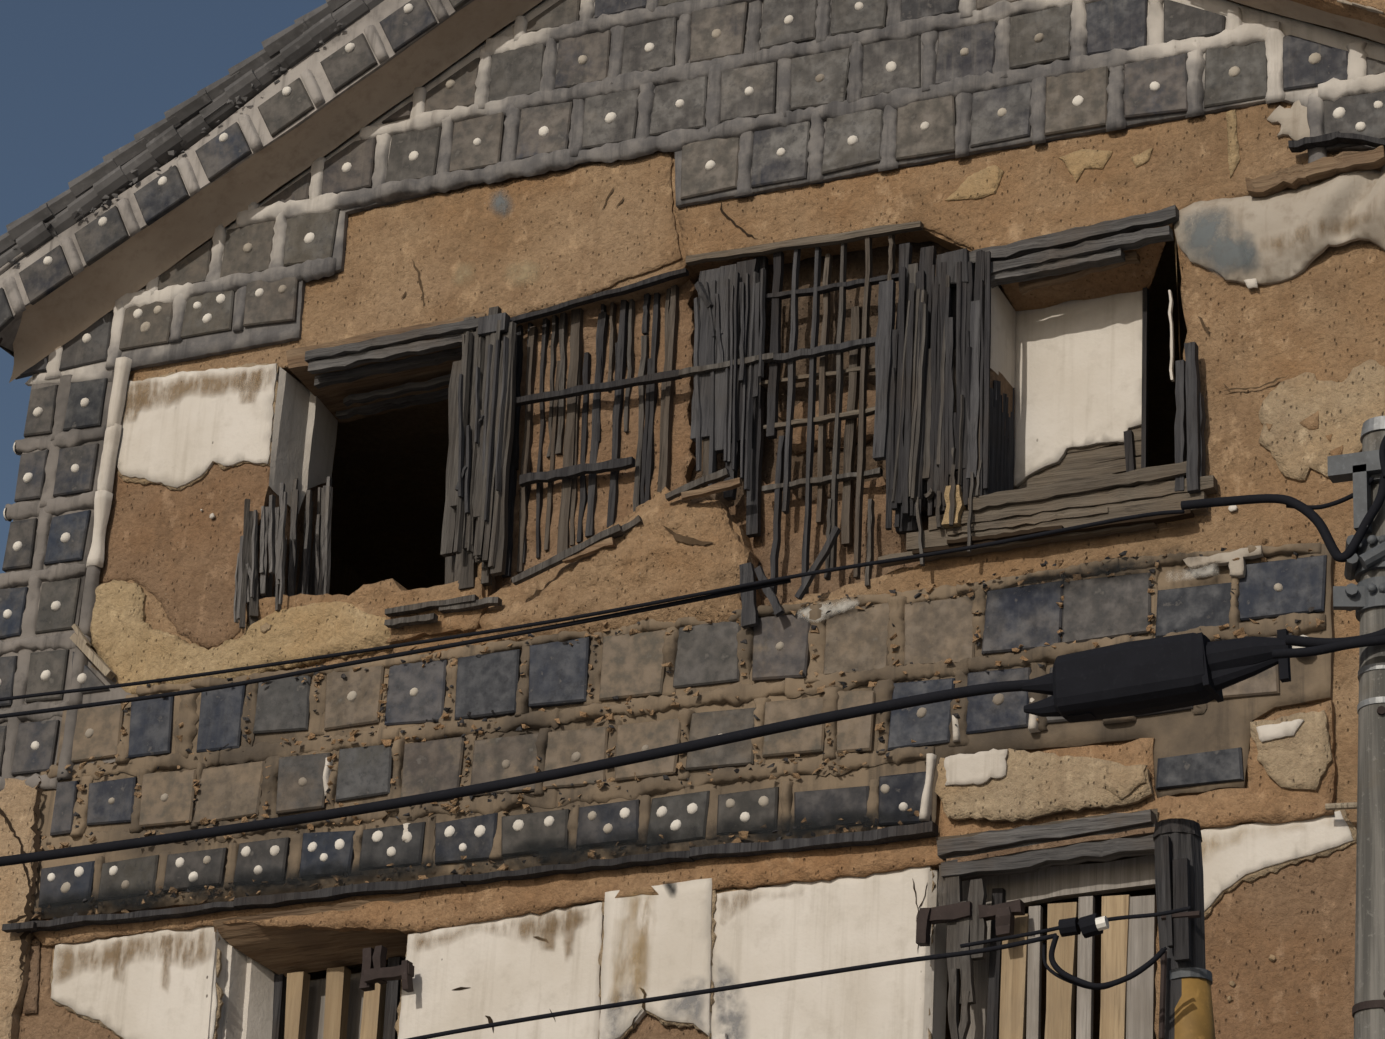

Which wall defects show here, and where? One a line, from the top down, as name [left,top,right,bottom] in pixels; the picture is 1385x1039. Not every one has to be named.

crack [720,203,758,239]
water stain [127,371,260,415]
spalling [1259,359,1385,482]
peeling [99,463,270,650]
crack [0,776,43,980]
peeling [18,936,122,1039]
peeling [625,1013,727,1039]